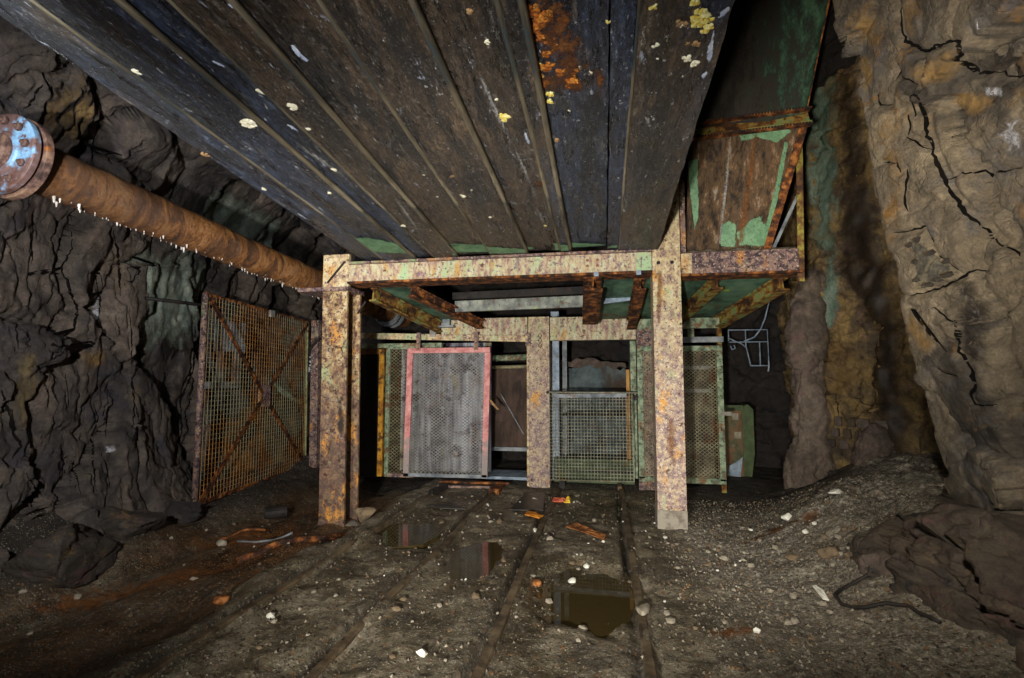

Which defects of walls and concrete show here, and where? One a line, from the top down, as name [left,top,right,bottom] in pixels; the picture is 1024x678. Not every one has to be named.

rust [527,0,604,98]
water stain [676,0,715,77]
rust [50,101,94,132]
peeling [688,159,699,229]
peeling [720,129,791,247]
rust [222,387,296,479]